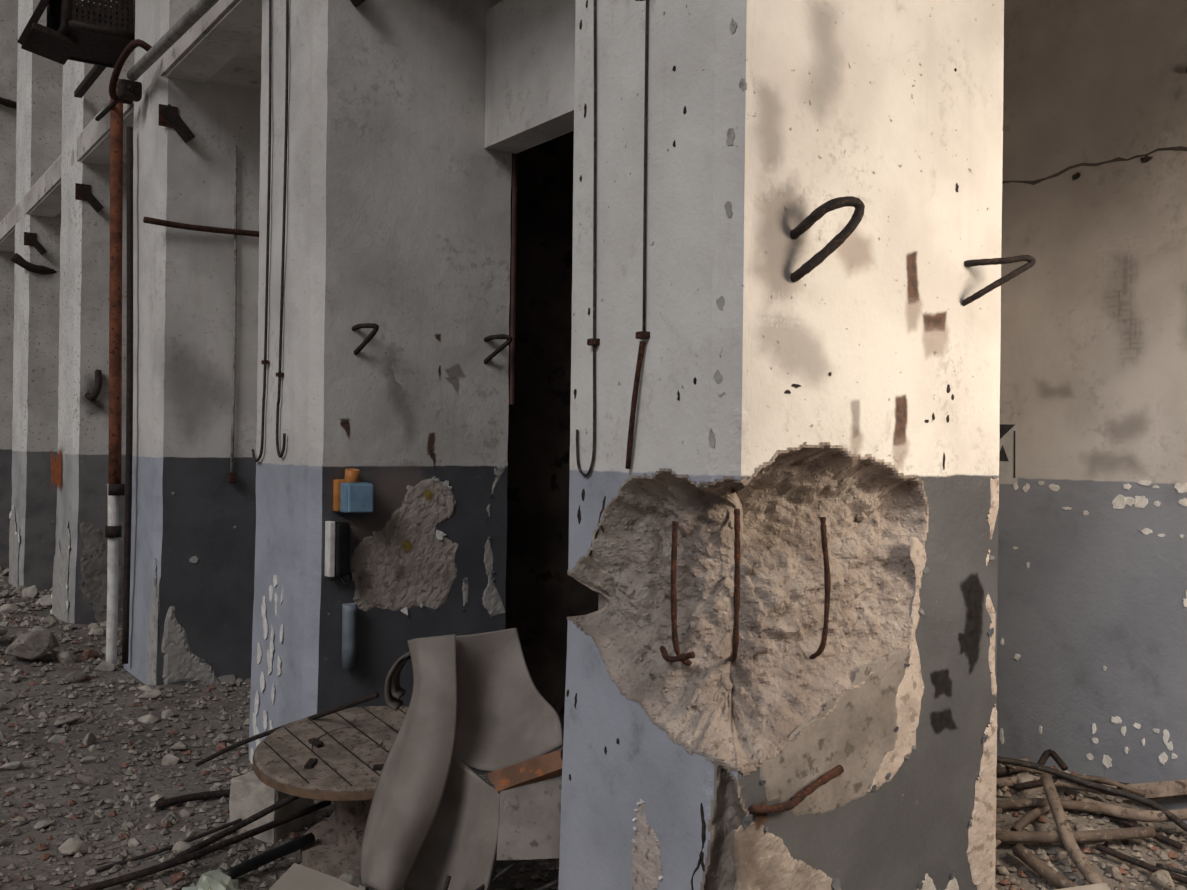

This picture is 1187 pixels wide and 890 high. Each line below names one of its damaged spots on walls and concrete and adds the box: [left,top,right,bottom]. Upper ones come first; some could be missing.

crack [1002,146,1187,185]
corrosion [907,252,919,303]
corrosion [924,312,946,331]
corrosion [894,396,907,445]
peeling [351,476,506,617]
peeling [986,475,999,566]
peeling [1112,480,1161,509]
peeling [147,558,235,686]
peeling [250,575,283,764]
spalling [567,442,930,890]
peeling [967,593,1004,890]
peeling [1111,716,1178,765]